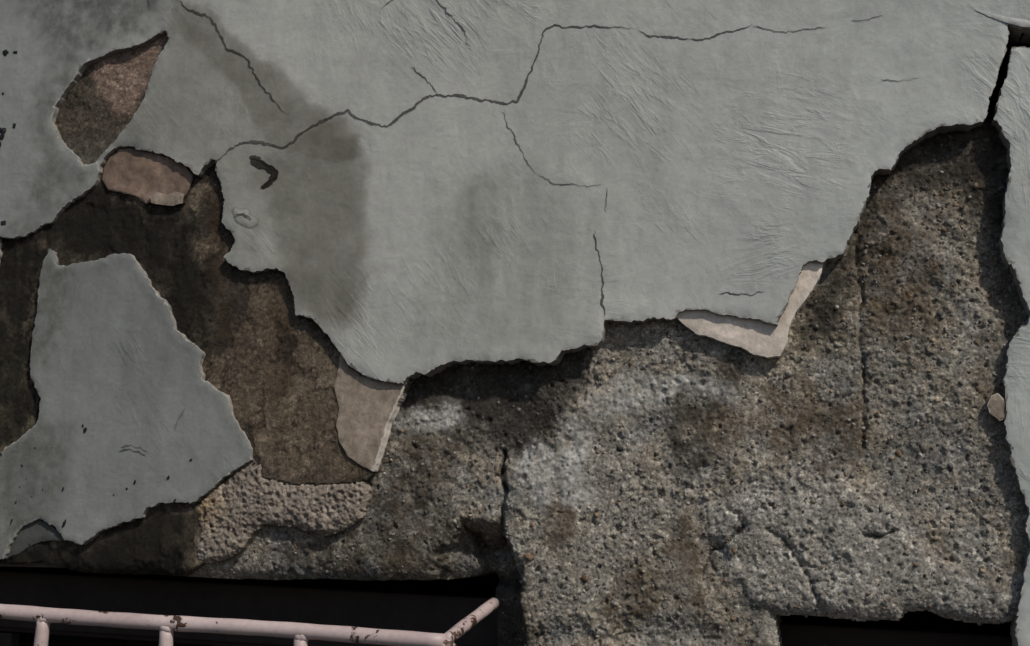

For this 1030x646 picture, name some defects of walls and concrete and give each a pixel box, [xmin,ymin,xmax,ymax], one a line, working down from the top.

spalling [55,34,168,165]
crack [177,0,284,112]
crack [437,0,471,49]
crack [214,24,828,207]
crack [973,8,1030,123]
peeling [0,224,177,316]
crack [593,231,605,316]
peeling [0,272,41,453]
spalling [47,120,1029,646]